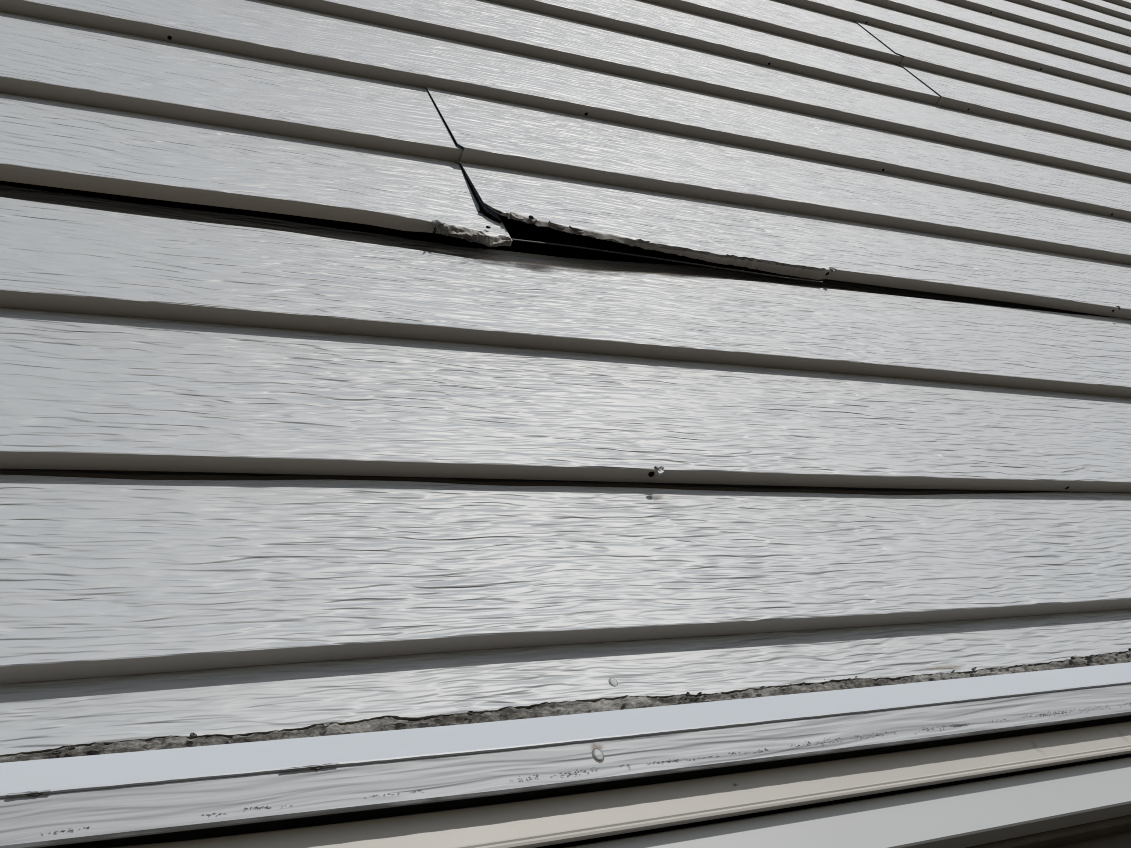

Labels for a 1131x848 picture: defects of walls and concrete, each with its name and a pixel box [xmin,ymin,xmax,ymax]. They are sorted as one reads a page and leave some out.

crack [428,92,502,223]
spalling [508,212,837,276]